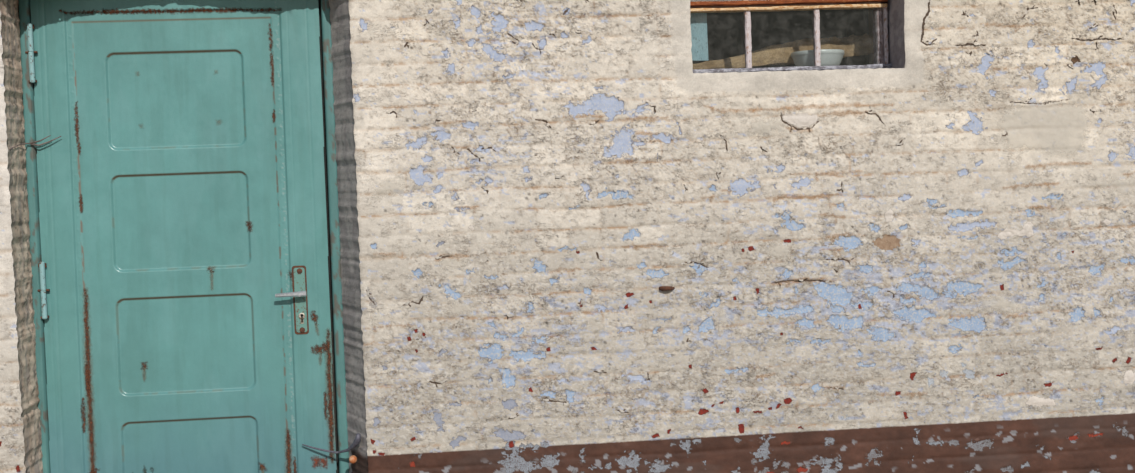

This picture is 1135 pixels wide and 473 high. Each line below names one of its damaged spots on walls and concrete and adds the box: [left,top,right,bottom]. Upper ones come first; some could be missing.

rust [59,7,281,85]
crack [921,1,986,55]
peeling [562,86,682,210]
crack [781,115,819,132]
spalling [832,223,921,252]
peeling [757,261,988,379]
rust [81,289,98,473]
rust [311,311,334,468]
rust [286,430,297,473]
spalling [733,398,792,443]
peeling [731,434,843,473]
peeling [903,412,994,464]